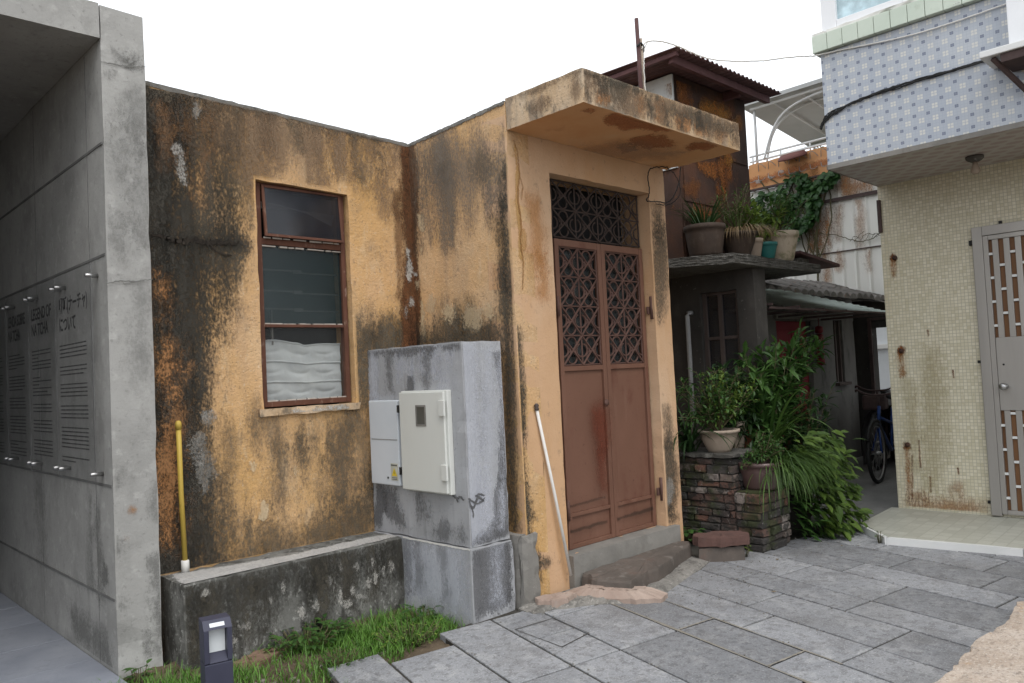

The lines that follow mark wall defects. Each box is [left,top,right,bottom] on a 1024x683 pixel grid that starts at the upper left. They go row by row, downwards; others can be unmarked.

leakage [512,69,740,147]
rust [667,80,742,129]
crack [151,233,240,256]
rust [399,146,422,347]
peeling [406,213,426,286]
leakage [652,208,669,323]
leakage [145,83,534,667]
rust [903,440,979,511]